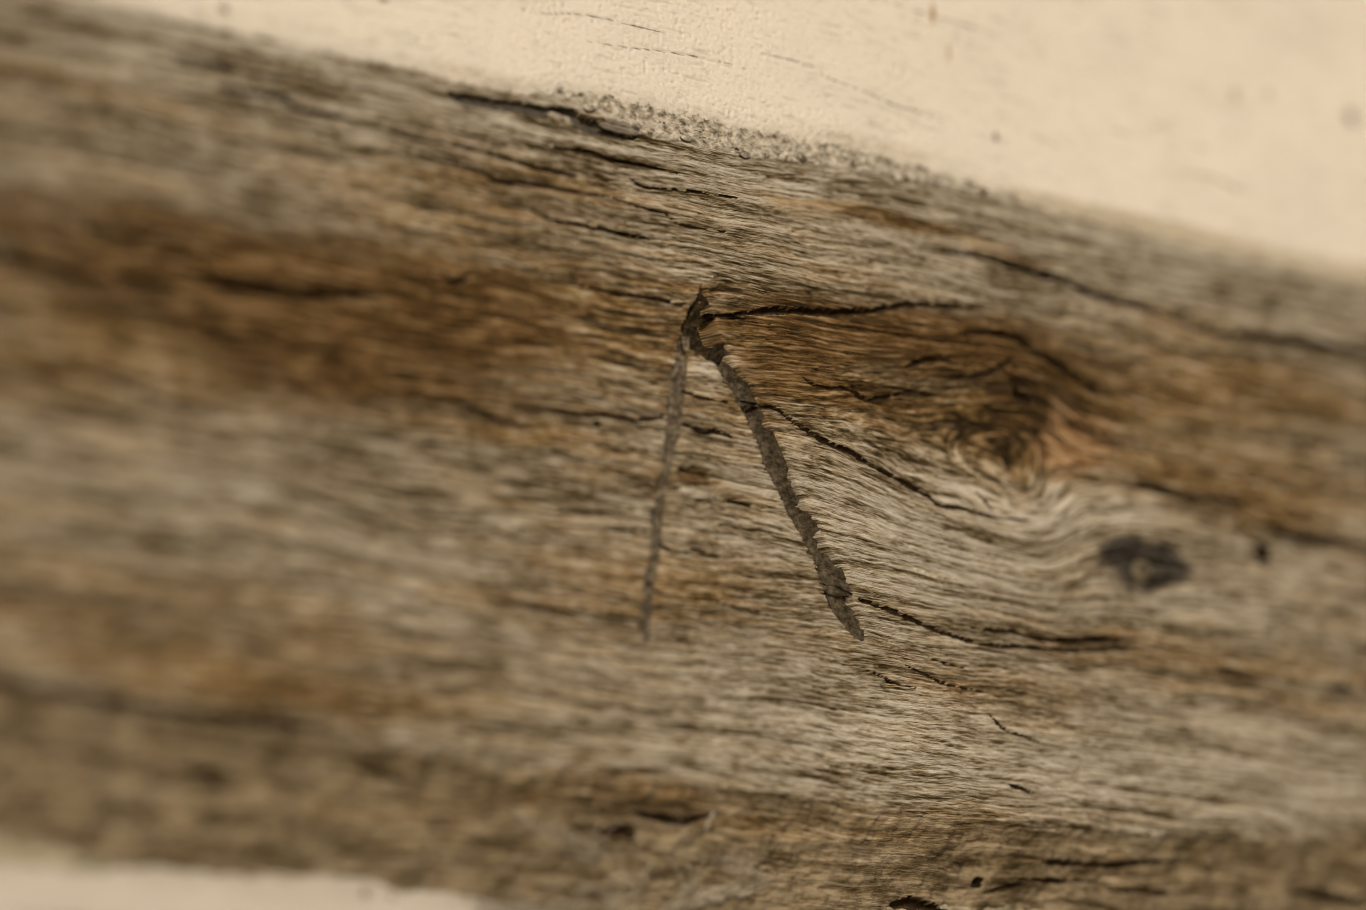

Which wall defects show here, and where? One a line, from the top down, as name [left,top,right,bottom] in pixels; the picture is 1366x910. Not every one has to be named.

crack [171,55,738,240]
crack [0,250,111,287]
crack [181,271,394,300]
crack [439,270,471,286]
crack [542,277,1112,446]
crack [365,390,1028,522]
crack [822,583,1140,743]